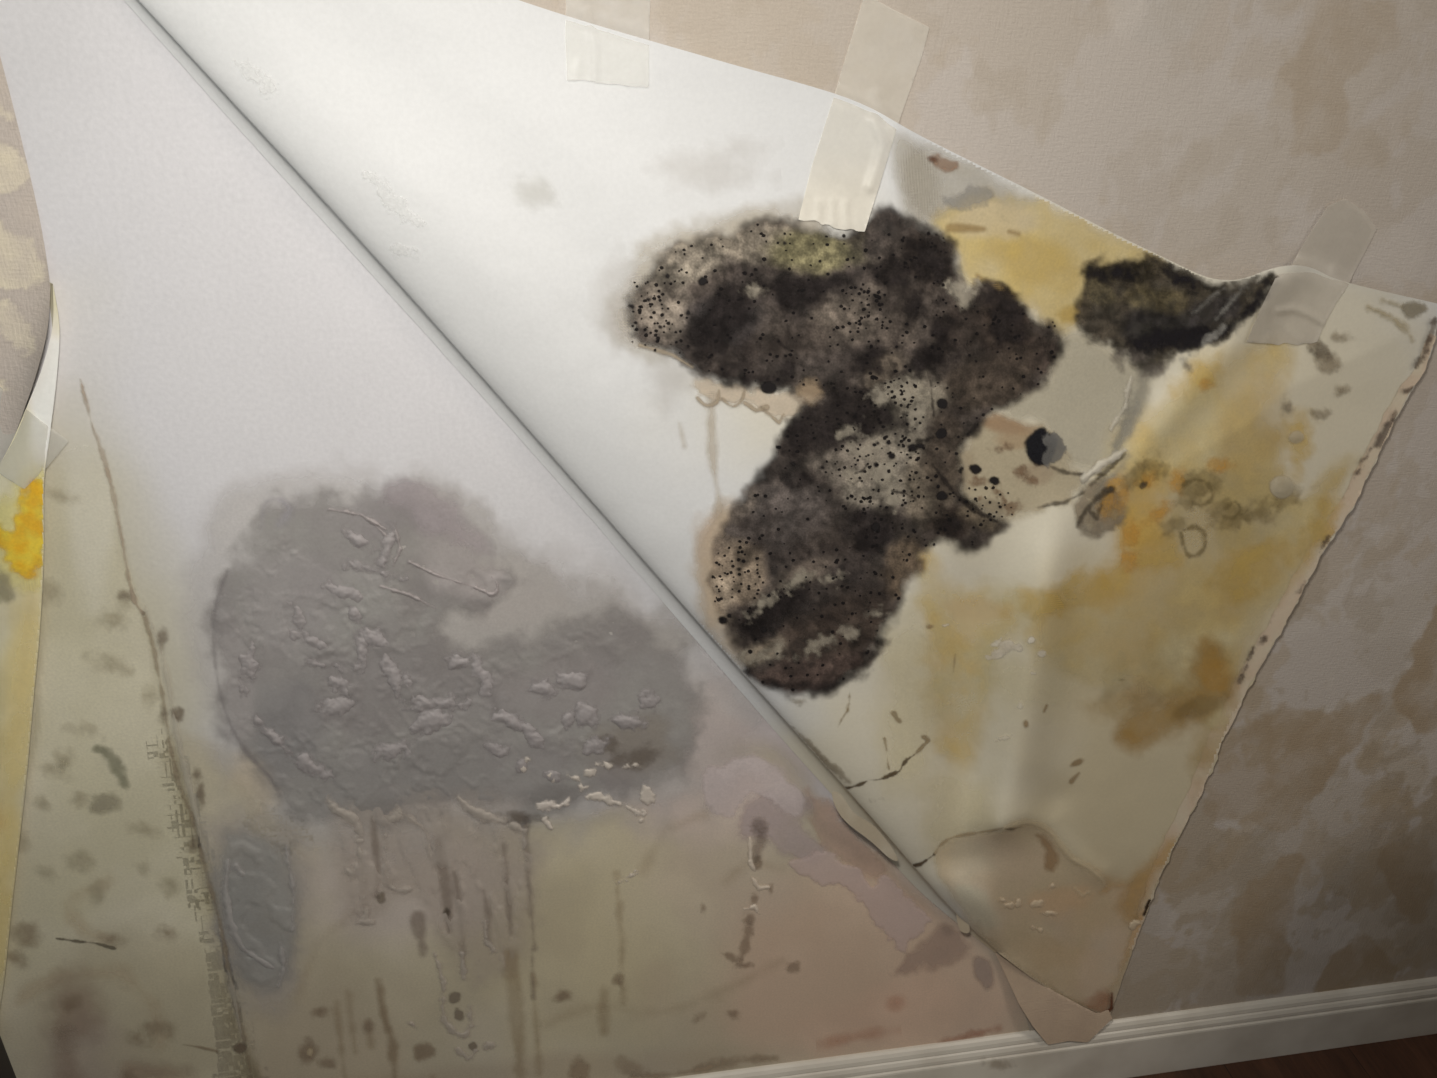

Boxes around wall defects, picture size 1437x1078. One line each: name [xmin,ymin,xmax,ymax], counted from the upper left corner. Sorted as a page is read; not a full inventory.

leakage [1369,302,1437,368]
leakage [620,143,1396,744]
leakage [0,483,1029,1078]
peeling [458,753,655,847]
crack [812,712,930,789]
crack [913,829,997,867]